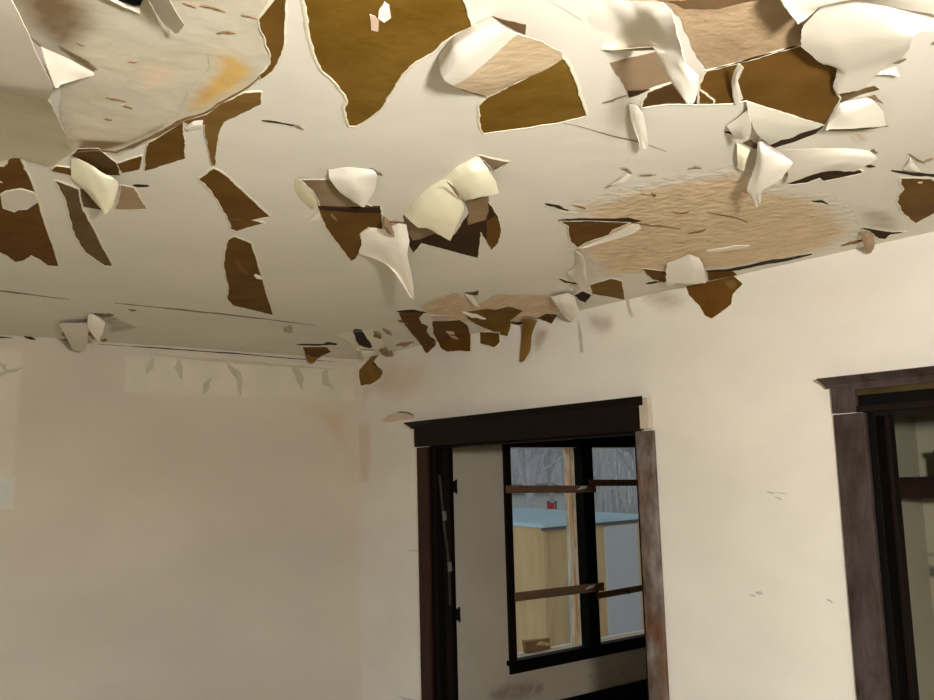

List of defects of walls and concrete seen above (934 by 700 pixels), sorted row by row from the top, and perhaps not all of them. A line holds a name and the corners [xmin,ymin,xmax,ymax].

peeling [860,231,875,253]
flaking render [334,328,414,359]